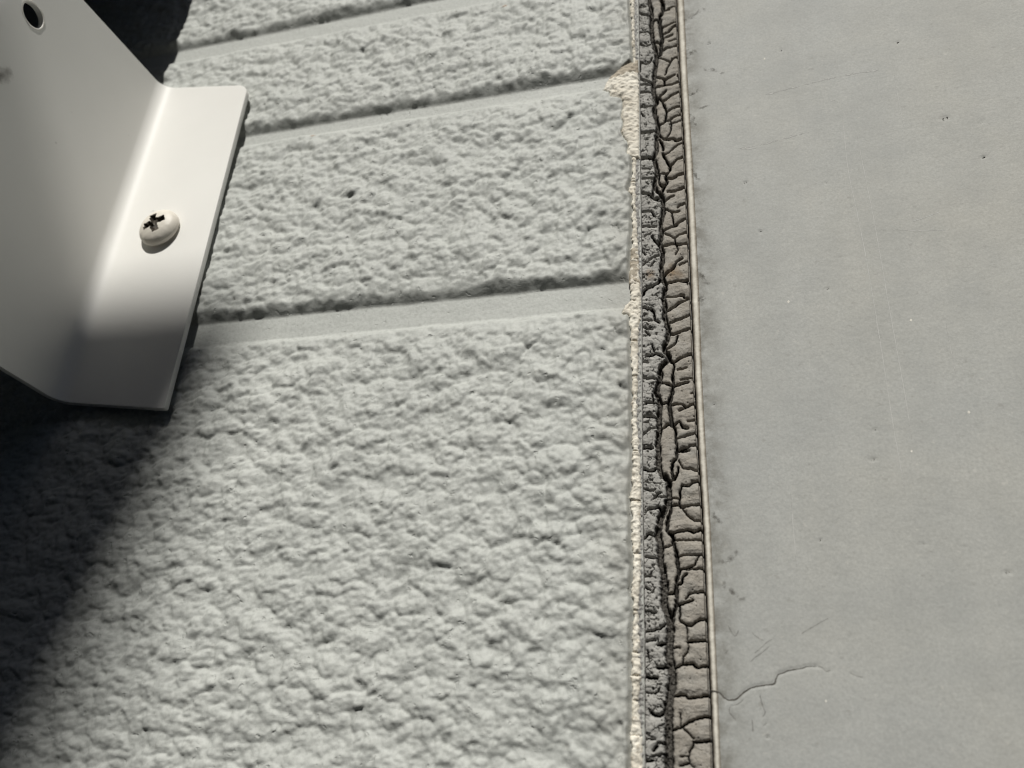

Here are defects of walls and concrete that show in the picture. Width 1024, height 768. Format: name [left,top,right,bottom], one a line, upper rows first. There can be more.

spalling [604,0,643,768]
crack [641,0,811,768]